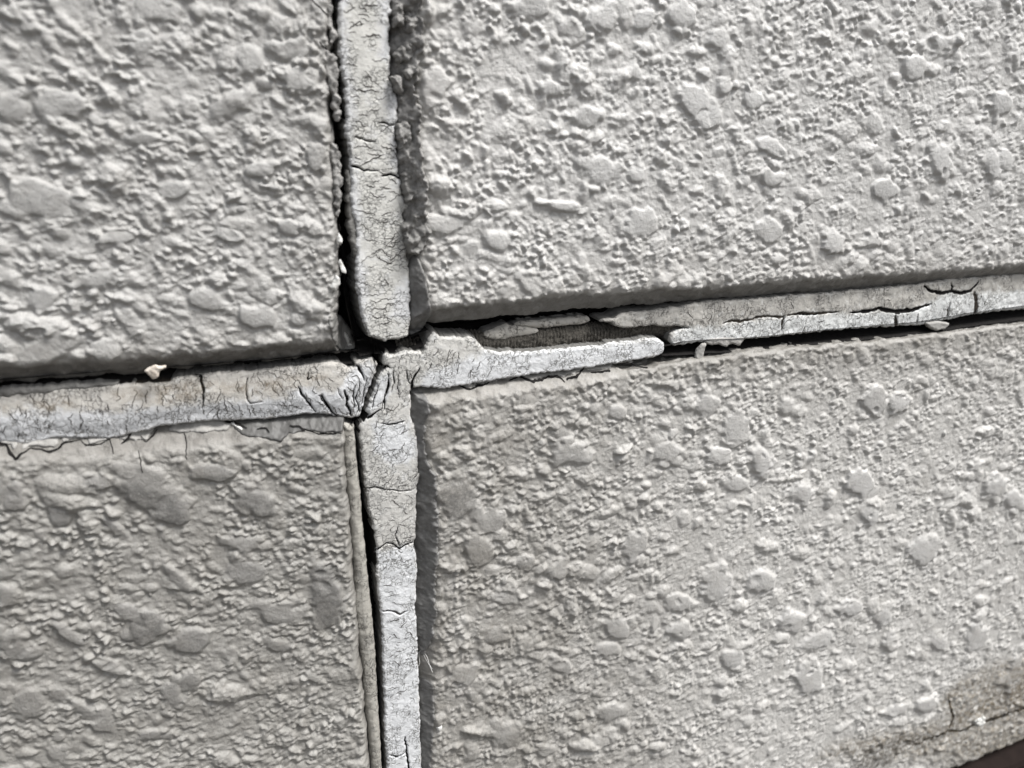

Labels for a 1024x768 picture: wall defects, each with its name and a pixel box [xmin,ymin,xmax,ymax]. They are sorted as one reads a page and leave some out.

crack [687,278,995,331]
crack [0,0,648,768]
peeling [462,360,633,387]